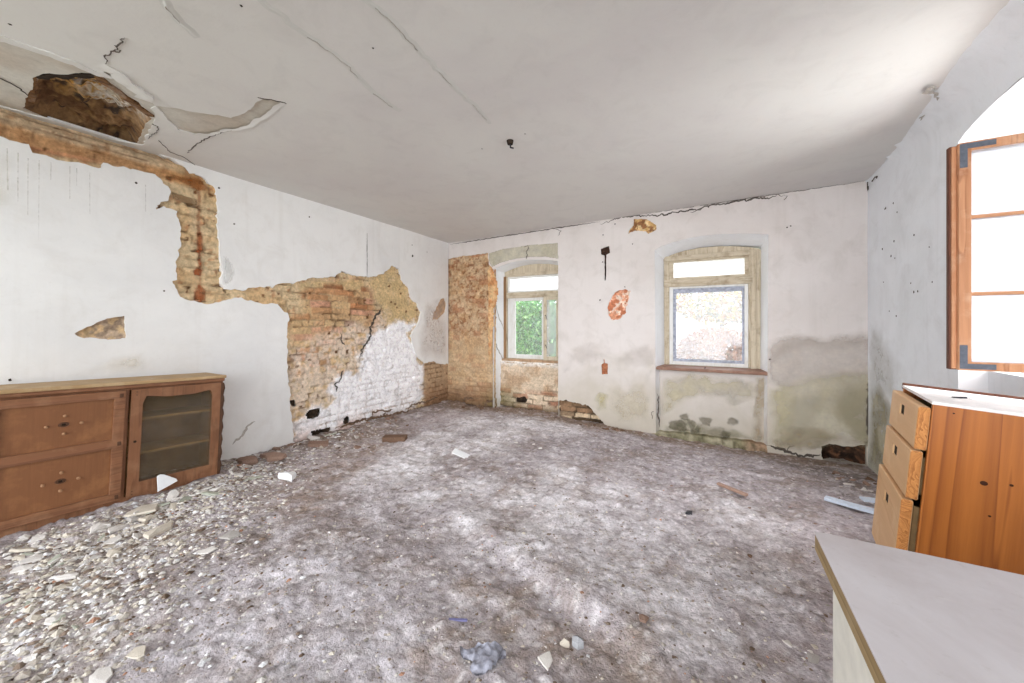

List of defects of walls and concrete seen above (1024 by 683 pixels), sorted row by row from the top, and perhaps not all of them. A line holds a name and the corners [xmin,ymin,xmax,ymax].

crack [103,38,124,64]
crack [258,0,403,112]
crack [361,0,492,124]
flaking render [0,34,558,442]
spalling [628,219,656,234]
crack [450,176,878,259]
spalling [608,289,630,320]
leakage [668,340,887,463]
crack [768,445,820,458]
spalling [821,444,865,464]